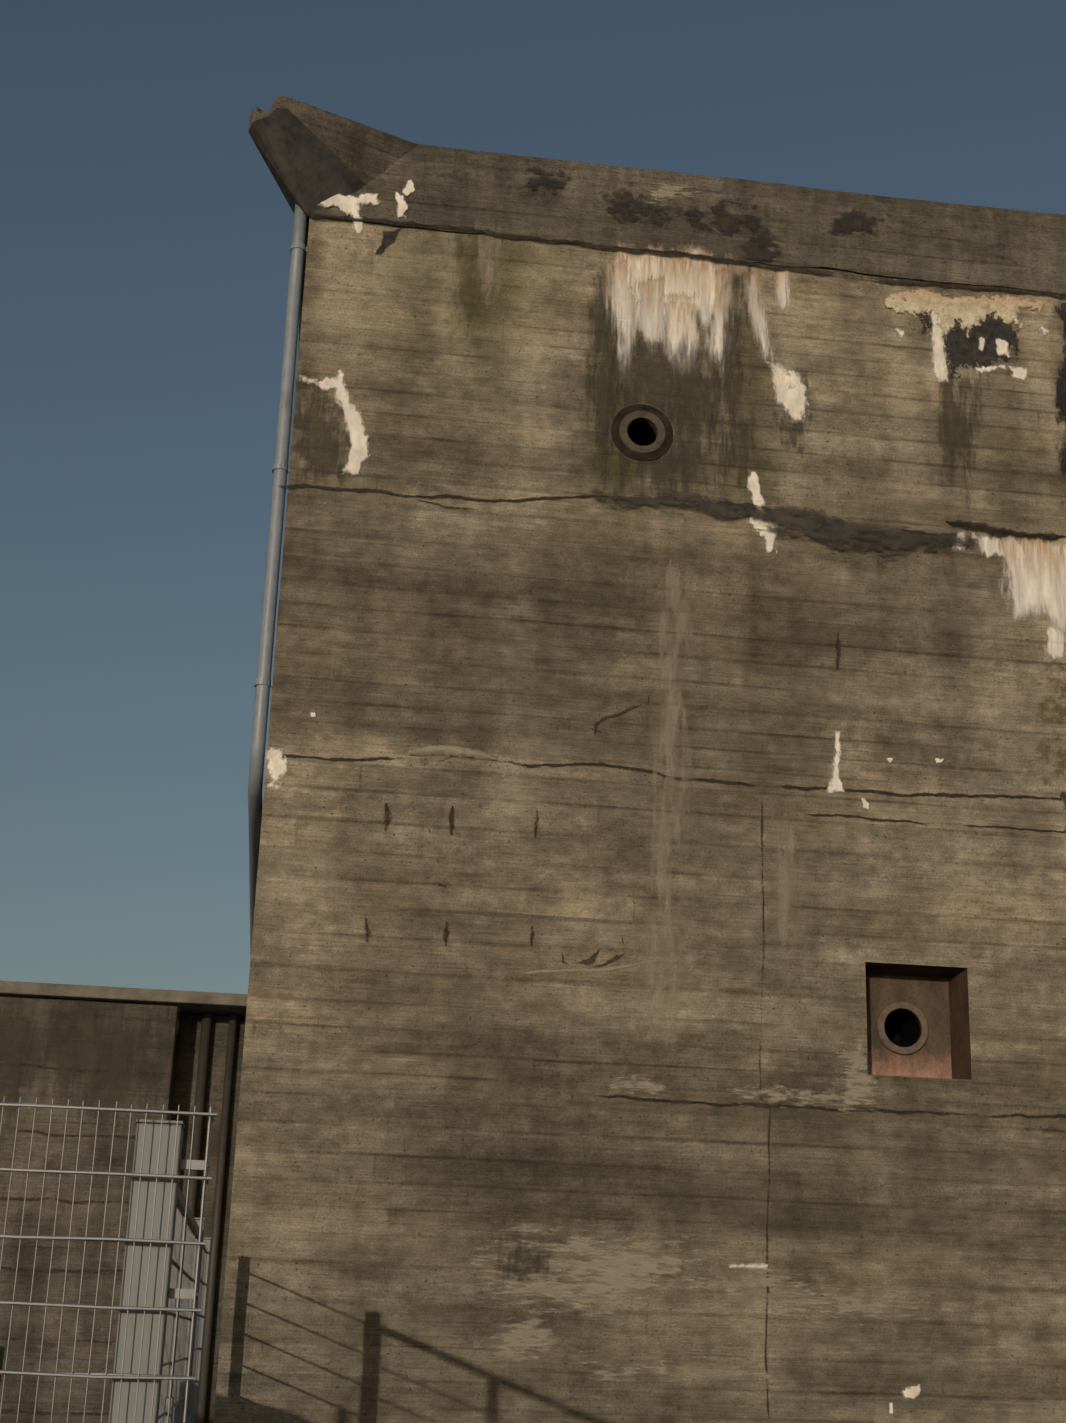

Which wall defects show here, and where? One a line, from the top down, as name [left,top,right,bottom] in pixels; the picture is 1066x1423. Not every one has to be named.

leakage [651,183,688,203]
leakage [587,243,812,553]
spalling [884,288,1066,382]
leakage [1055,306,1066,475]
crack [280,484,626,510]
crack [903,520,1066,541]
leakage [953,532,1066,659]
crack [263,696,1066,974]
crack [598,1046,1066,1419]